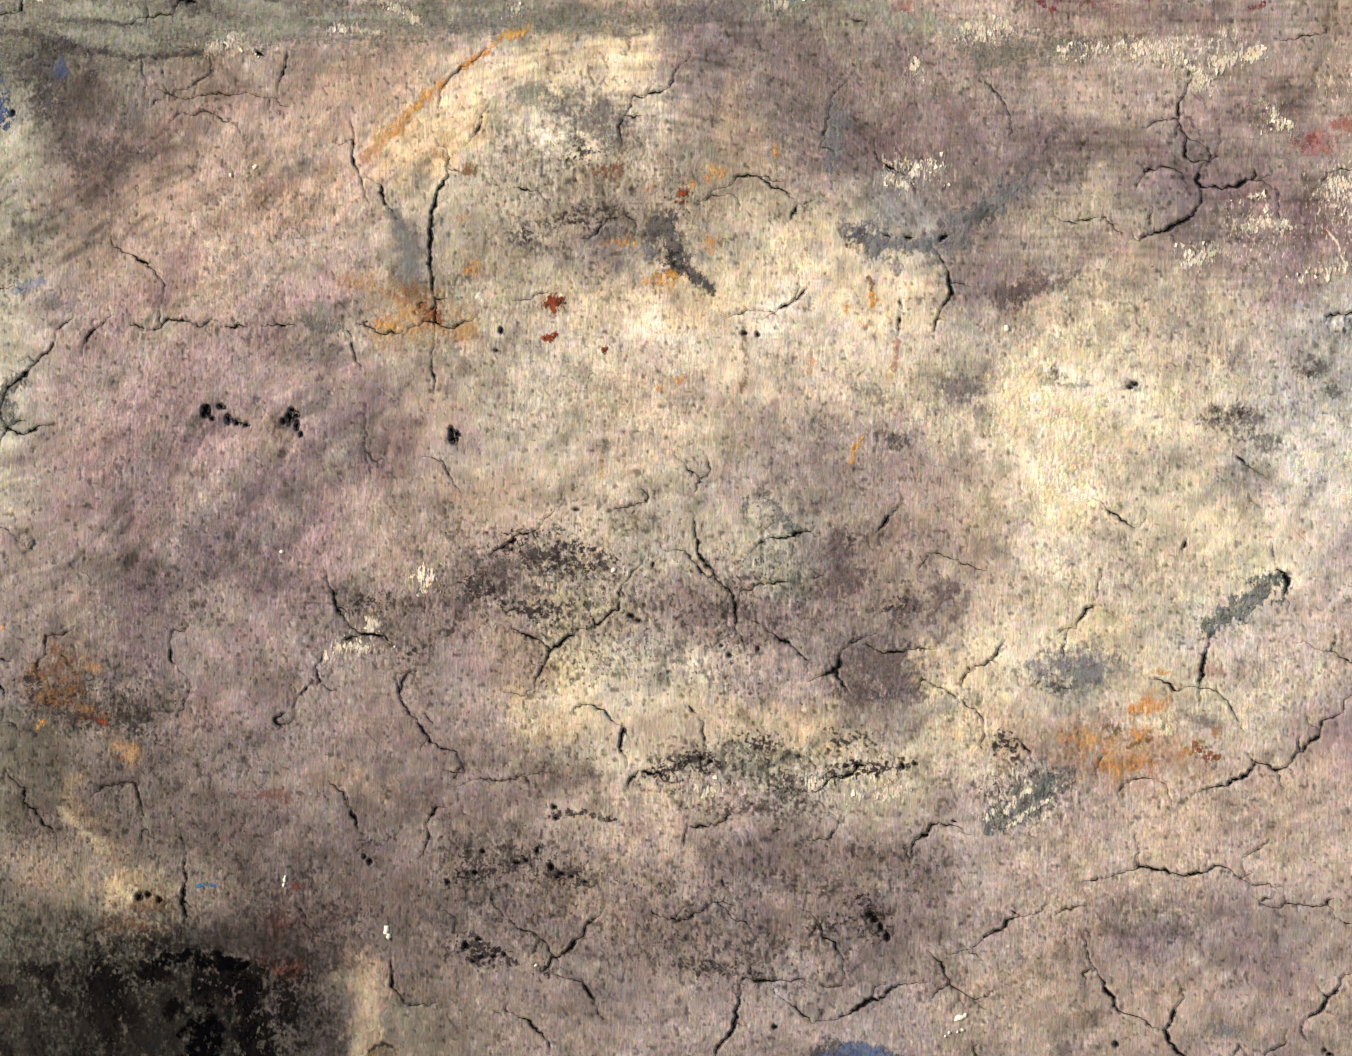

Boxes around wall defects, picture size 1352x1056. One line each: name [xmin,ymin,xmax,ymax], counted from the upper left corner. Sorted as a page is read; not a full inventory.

rust [359,81,446,163]
rust [459,24,530,69]
crack [0,241,296,441]
crack [339,101,491,393]
rust [541,292,566,343]
crack [503,456,1005,748]
rust [12,646,161,762]
crack [274,572,548,855]
rust [1061,698,1176,779]
rust [1181,728,1221,762]
crack [1098,631,1350,810]
crack [651,835,1352,1056]